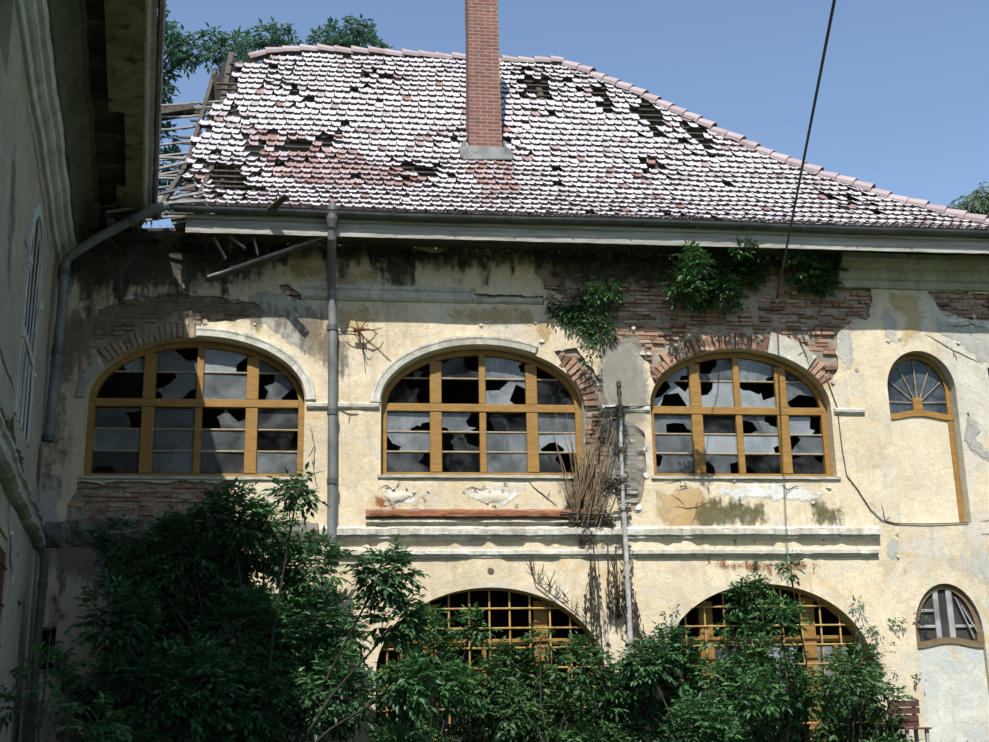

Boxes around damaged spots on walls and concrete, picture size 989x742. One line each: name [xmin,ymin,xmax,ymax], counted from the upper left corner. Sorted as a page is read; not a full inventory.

flaking render [40,475,239,523]
water stain [38,241,351,489]
flaking render [446,250,989,514]
peeling [657,479,831,526]